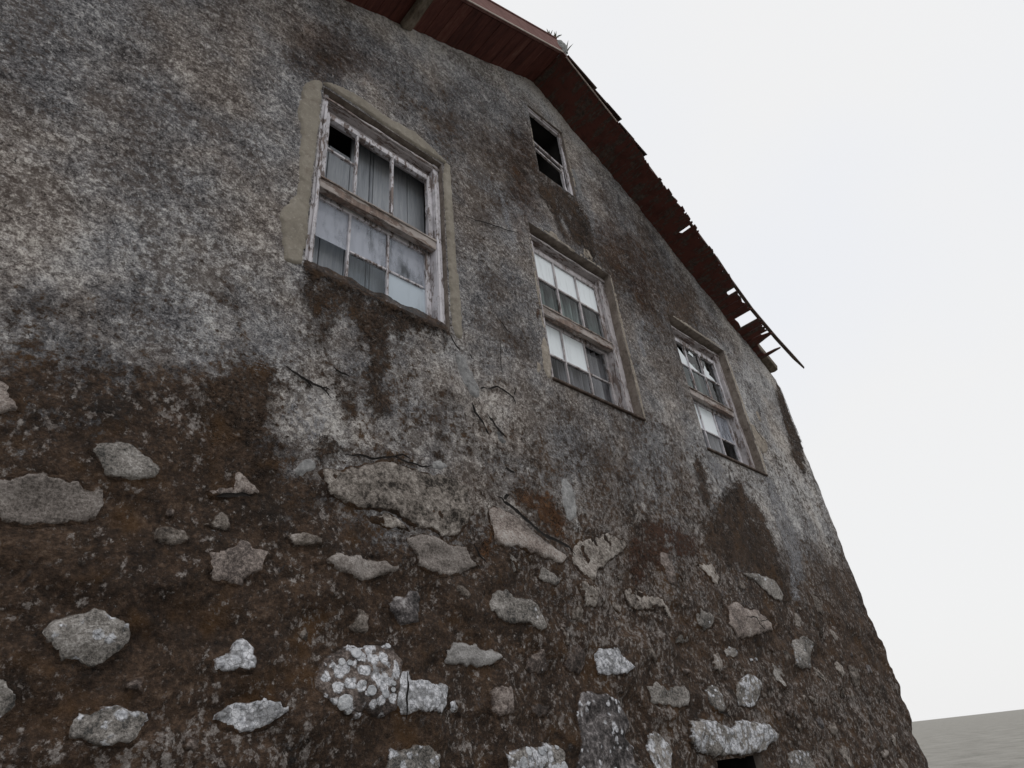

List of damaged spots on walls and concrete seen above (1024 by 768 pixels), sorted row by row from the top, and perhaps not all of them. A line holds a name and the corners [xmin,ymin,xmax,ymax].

damp [300,279,343,344]
crack [285,365,350,398]
damp [336,317,400,426]
spalling [0,439,163,529]
crack [345,454,430,467]
crack [497,467,575,555]
spalling [35,604,136,672]
spalling [212,638,259,676]
spalling [212,694,293,736]
spalling [312,641,461,720]
spalling [503,688,674,768]
spalling [645,601,788,759]